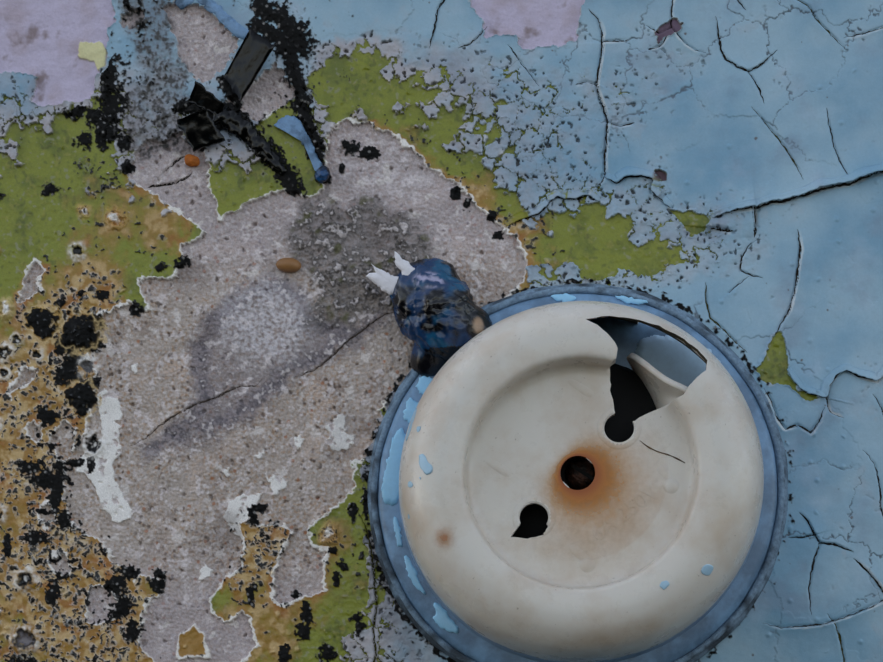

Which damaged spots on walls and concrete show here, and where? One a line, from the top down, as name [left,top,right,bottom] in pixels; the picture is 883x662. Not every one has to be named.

peeling [470,0,585,49]
peeling [655,18,683,44]
crack [504,10,674,226]
crack [648,0,883,293]
flaking render [0,0,529,662]
peeling [521,186,717,286]
peeling [635,335,706,387]
peeling [755,332,818,401]
crack [775,229,801,335]
crack [765,364,883,433]
damp [1,281,167,643]
crack [768,512,883,662]